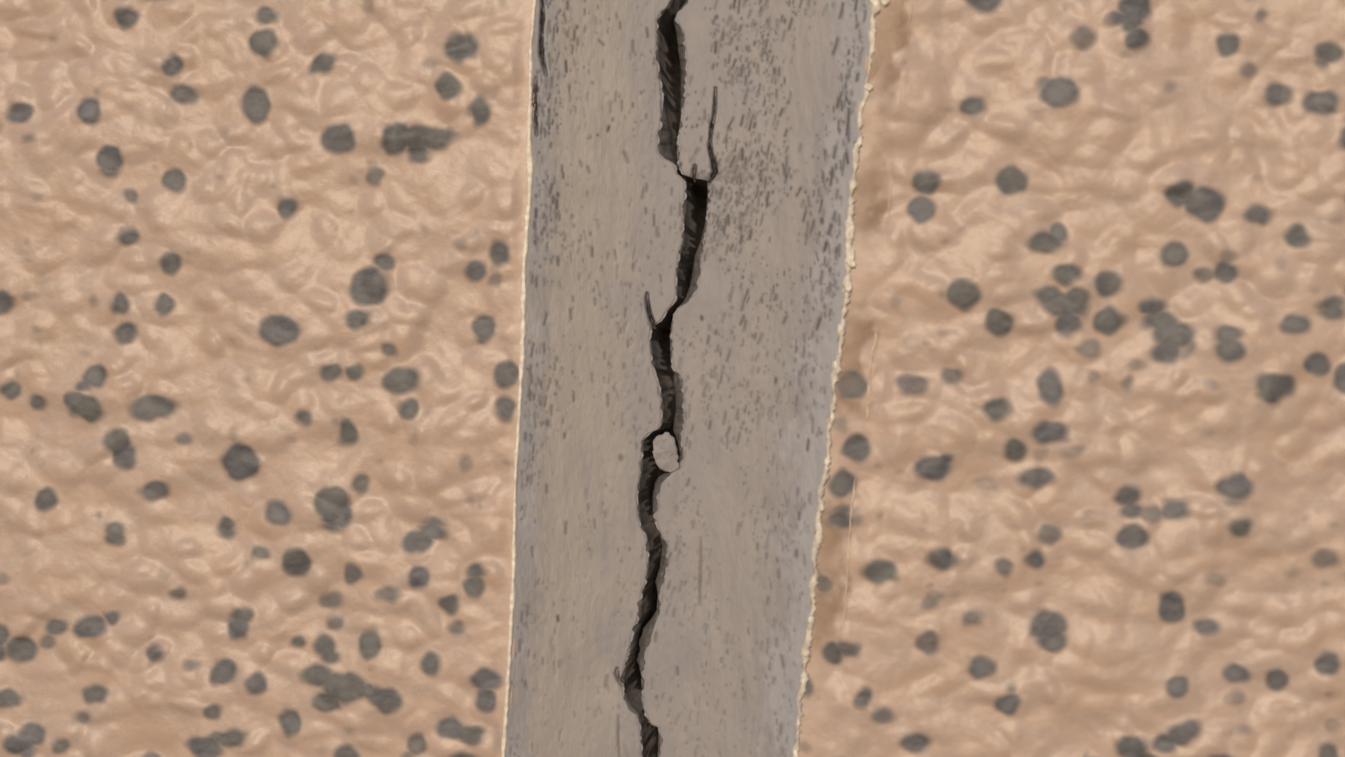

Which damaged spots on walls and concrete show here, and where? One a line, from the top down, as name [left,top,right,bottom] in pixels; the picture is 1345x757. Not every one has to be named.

crack [615,0,717,757]